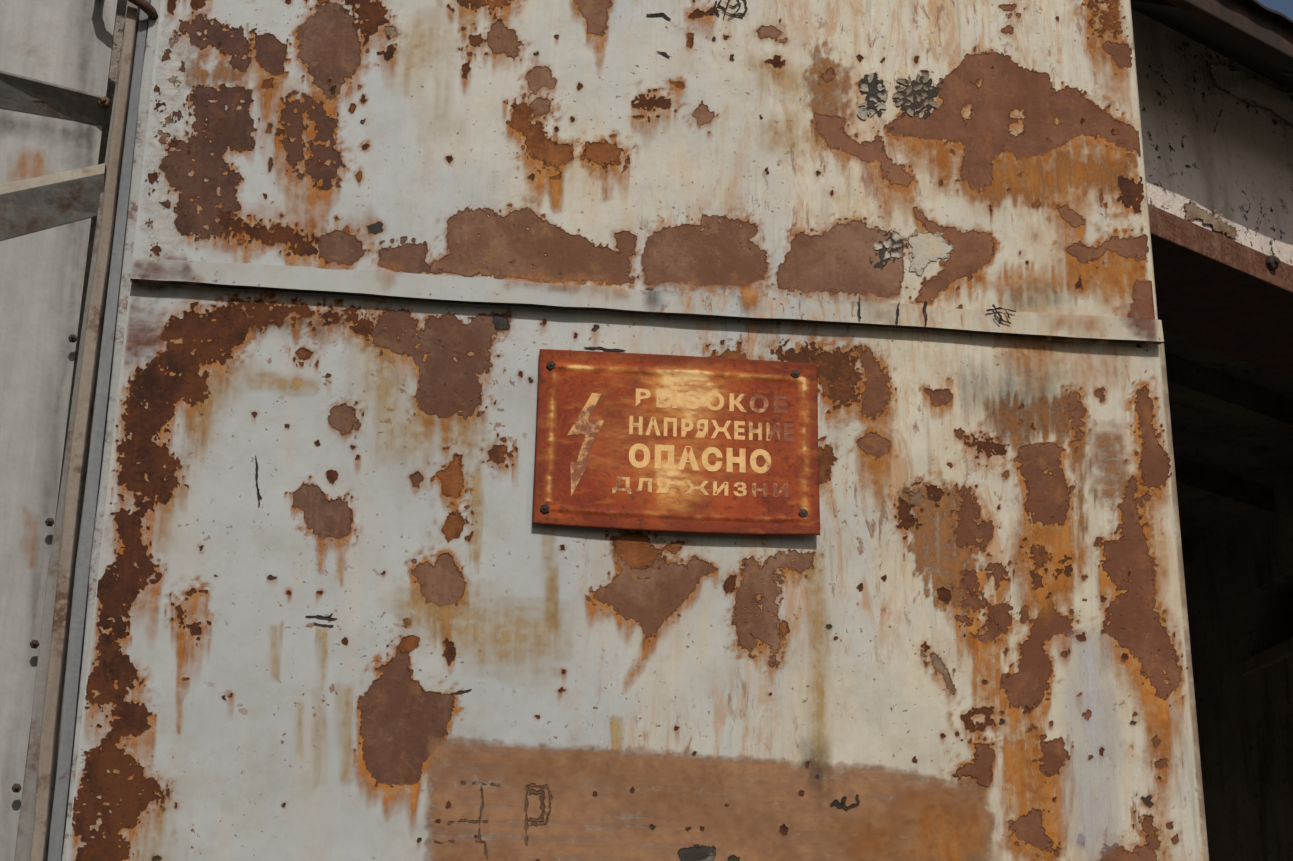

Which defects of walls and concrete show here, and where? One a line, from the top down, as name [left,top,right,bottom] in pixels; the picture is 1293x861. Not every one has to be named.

peeling [141,0,1141,306]
corrosion [70,291,376,861]
peeling [285,476,358,549]
peeling [365,308,512,429]
peeling [409,550,468,628]
peeling [585,536,719,645]
peeling [731,549,823,674]
corrosion [702,336,870,487]
corrosion [855,338,1107,858]
corrosion [1123,377,1172,520]
peeling [354,649,463,819]
corrosion [1132,733,1179,856]